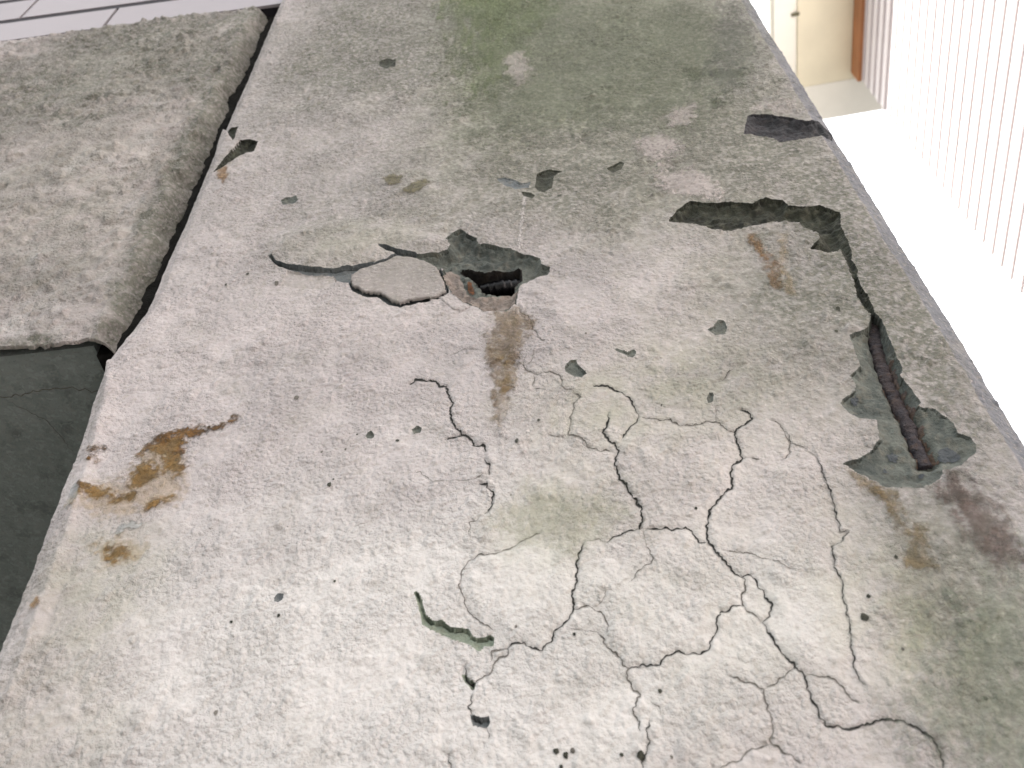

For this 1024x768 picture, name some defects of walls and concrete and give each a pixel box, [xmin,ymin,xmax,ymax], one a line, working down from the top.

peeling [213,127,258,172]
spalling [744,114,833,142]
spalling [497,169,562,198]
spalling [268,229,550,312]
spalling [669,197,976,488]
rust [76,414,238,511]
rust [103,545,130,564]
crack [410,312,944,768]
peeling [414,591,494,651]